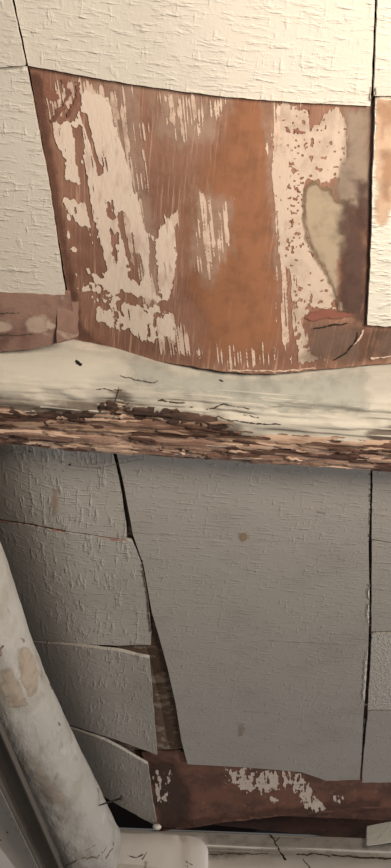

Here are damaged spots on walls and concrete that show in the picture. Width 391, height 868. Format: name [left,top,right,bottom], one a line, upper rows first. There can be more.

peeling [40,78,177,343]
rust [191,105,277,358]
peeling [272,101,354,364]
water stain [303,88,391,359]
peeling [225,767,326,813]